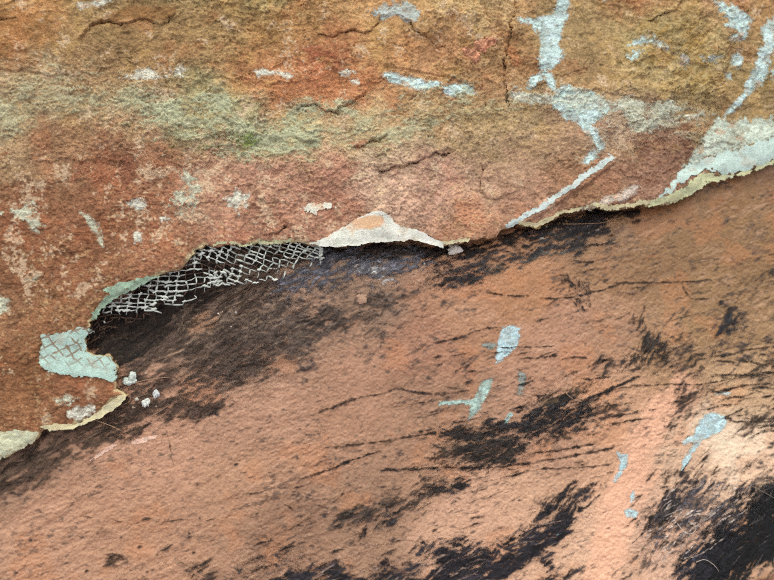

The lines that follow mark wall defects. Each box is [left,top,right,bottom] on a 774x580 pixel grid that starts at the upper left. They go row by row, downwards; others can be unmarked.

peeling [505,0,774,228]
peeling [80,212,103,247]
peeling [125,197,147,211]
peeling [213,238,292,247]
peeling [310,211,470,248]
peeling [39,276,160,382]
water stain [0,209,641,497]
water stain [654,300,774,439]
peeling [0,395,126,460]
water stain [243,538,291,578]
water stain [269,479,600,580]
water stain [613,454,774,580]